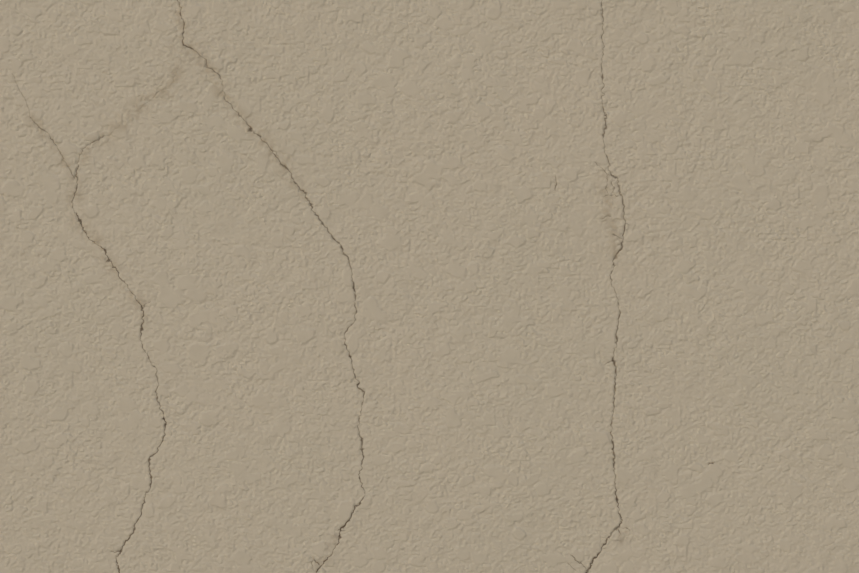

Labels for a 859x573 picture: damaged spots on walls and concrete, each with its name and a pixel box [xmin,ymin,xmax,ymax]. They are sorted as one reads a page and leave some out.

crack [72,196,167,573]
crack [291,176,364,572]
crack [574,206,628,573]